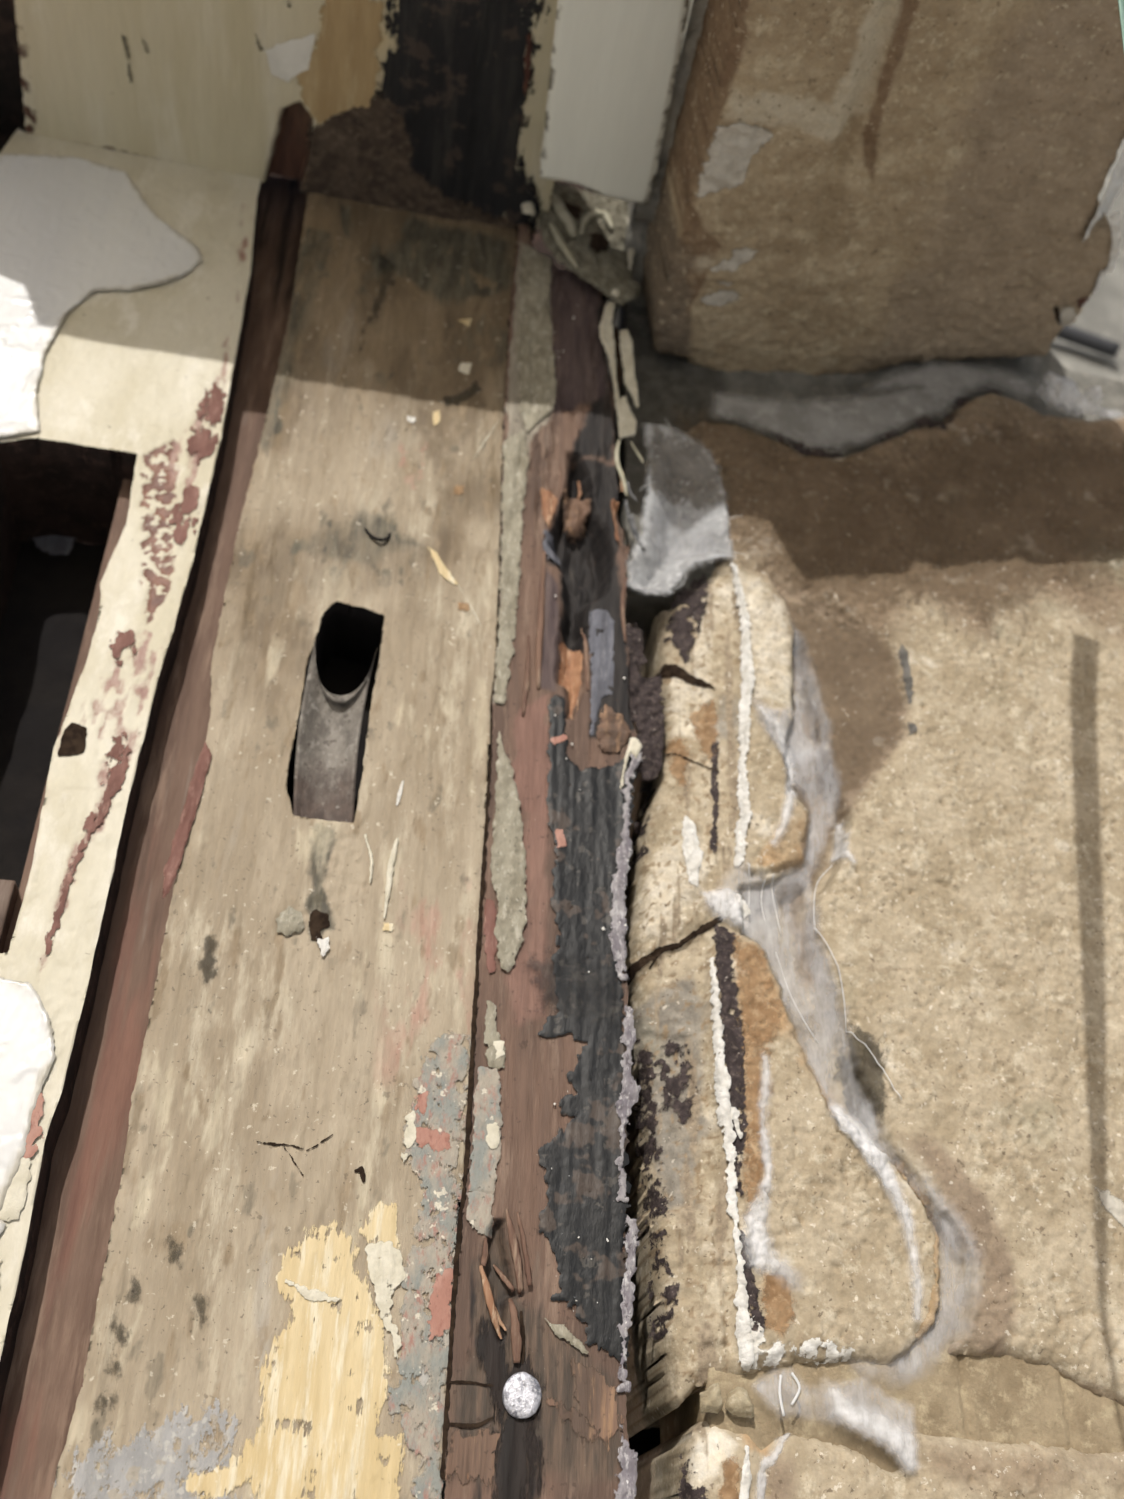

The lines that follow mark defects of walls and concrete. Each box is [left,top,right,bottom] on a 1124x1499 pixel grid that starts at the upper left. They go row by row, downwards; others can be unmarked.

peeling [255,0,384,124]
damp [300,0,551,241]
peeling [0,154,203,437]
peeling [0,977,56,1234]
peeling [54,1000,506,1499]
peeling [483,731,527,973]
peeling [538,694,660,1499]
crack [626,916,723,987]
damp [663,575,712,663]
damp [681,561,756,887]
damp [632,924,855,1372]
damp [834,1023,887,1133]